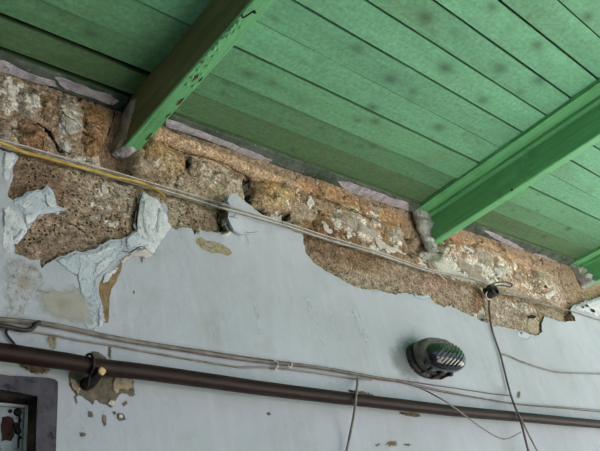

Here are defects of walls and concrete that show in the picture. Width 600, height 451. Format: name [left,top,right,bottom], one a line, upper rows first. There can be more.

crack [31,105,82,155]
spalling [0,60,600,340]
peeling [68,371,135,426]